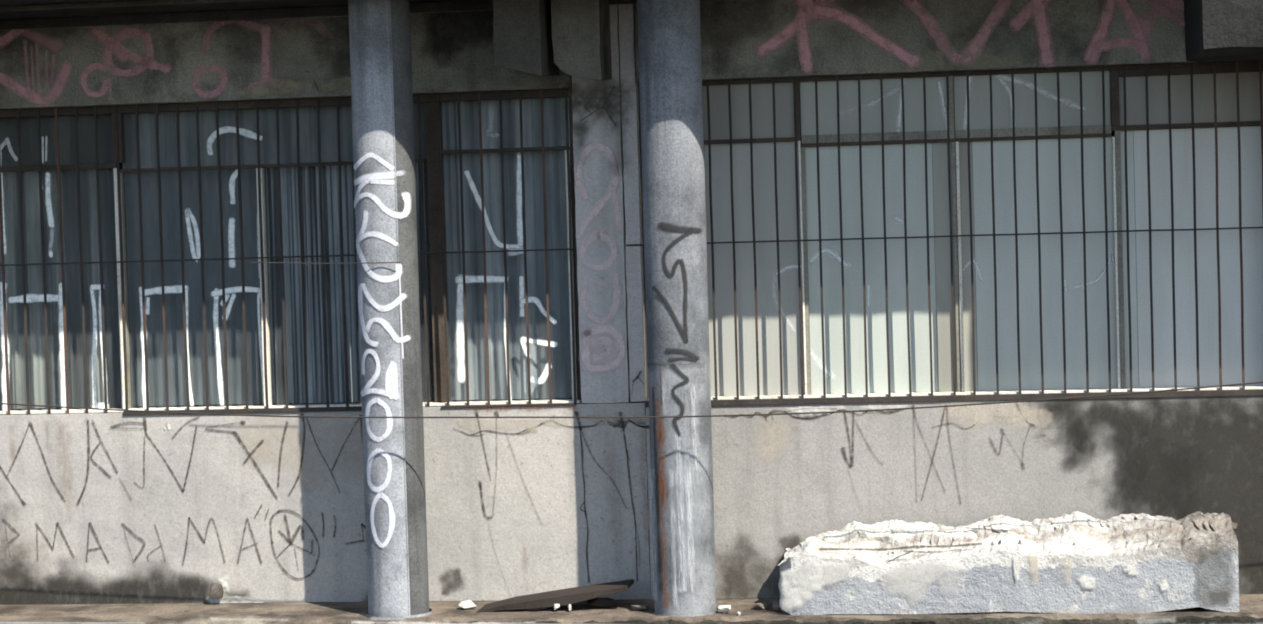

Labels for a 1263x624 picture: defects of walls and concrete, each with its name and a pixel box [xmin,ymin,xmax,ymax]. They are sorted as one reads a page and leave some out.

crack [455,419,650,582]
damp [1047,396,1263,594]
damp [0,548,209,605]
peeling [782,562,854,607]
peeling [1078,575,1095,588]